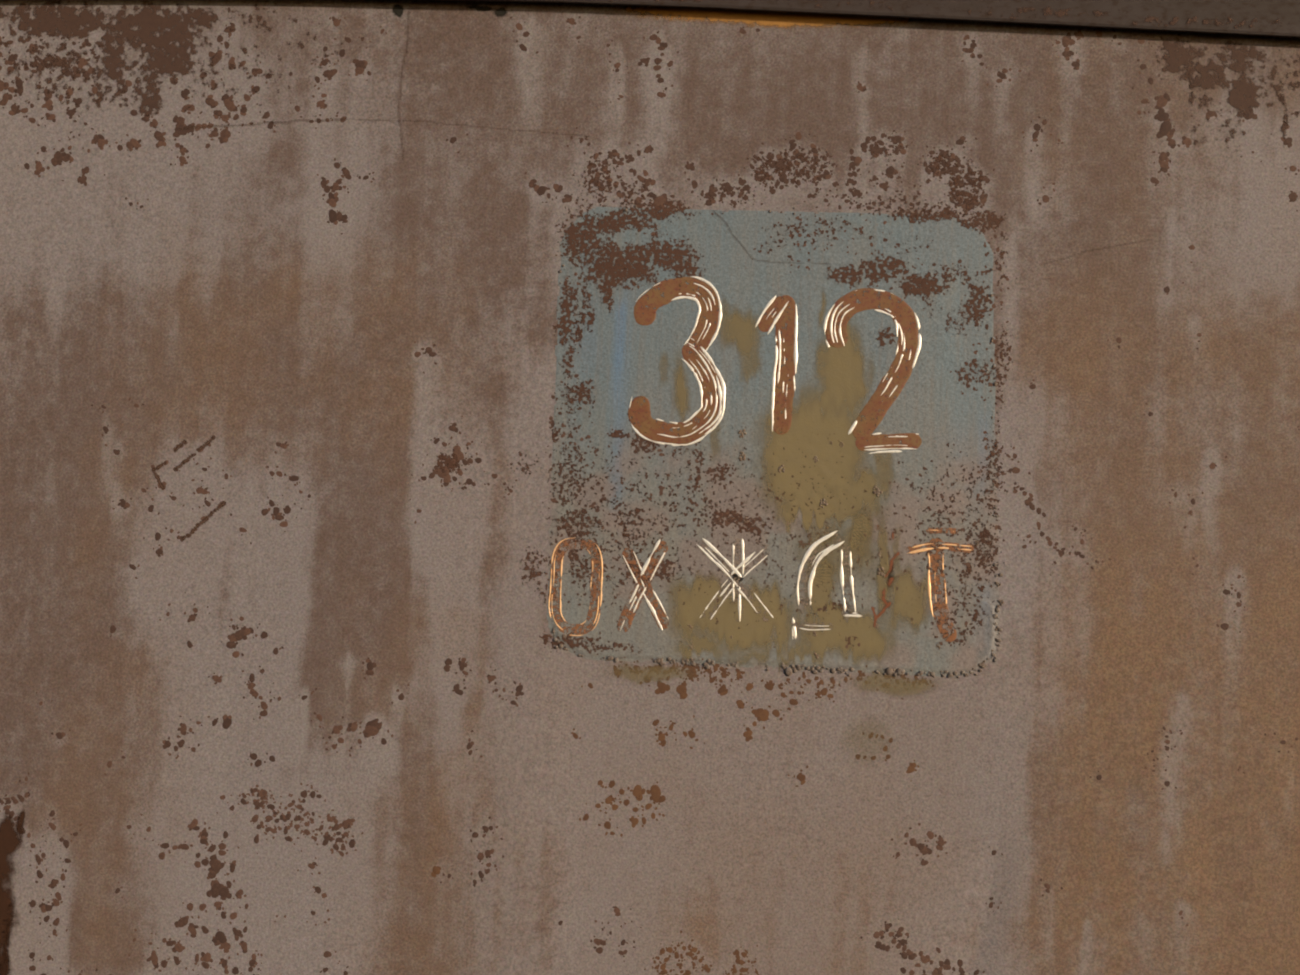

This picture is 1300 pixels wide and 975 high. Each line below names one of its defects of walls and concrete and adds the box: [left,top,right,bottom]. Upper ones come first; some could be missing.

peeling [162,111,254,166]
peeling [510,197,1017,656]
damp [674,296,927,670]